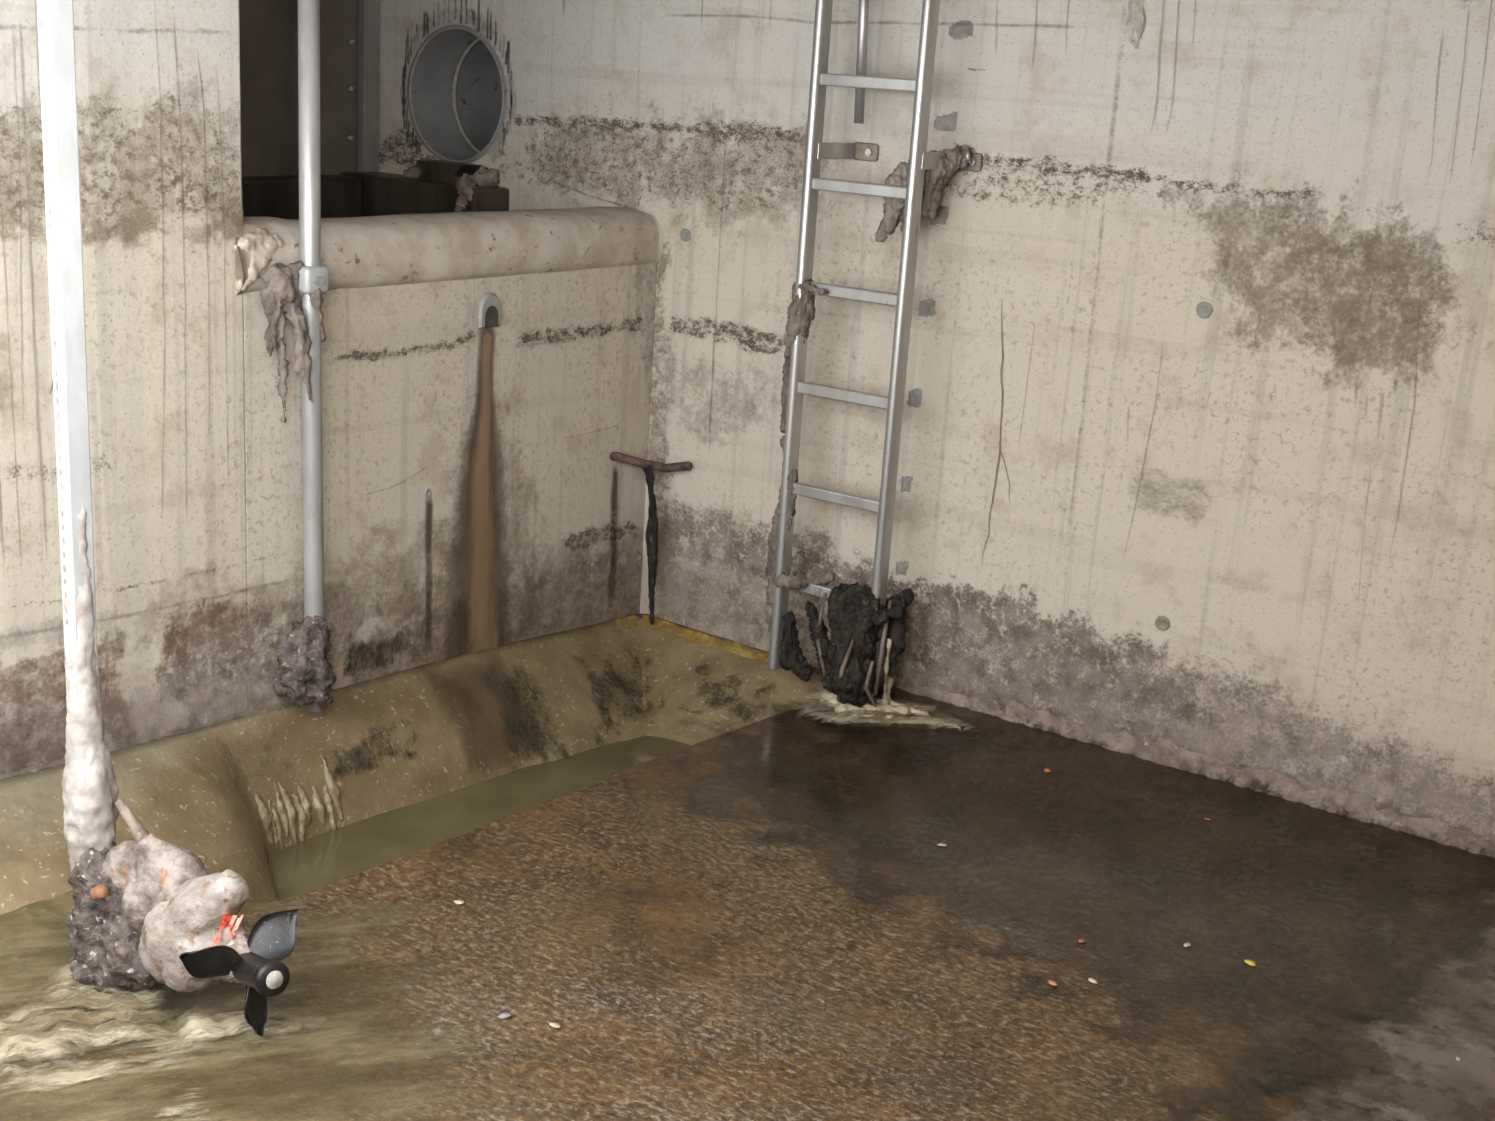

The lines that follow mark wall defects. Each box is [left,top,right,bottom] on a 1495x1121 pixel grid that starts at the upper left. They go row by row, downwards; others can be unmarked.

damp [0,106,45,236]
damp [77,78,243,239]
damp [379,0,806,210]
damp [946,145,1453,382]
damp [329,244,786,683]
damp [60,484,119,871]
damp [159,629,283,728]
damp [682,532,1495,1121]